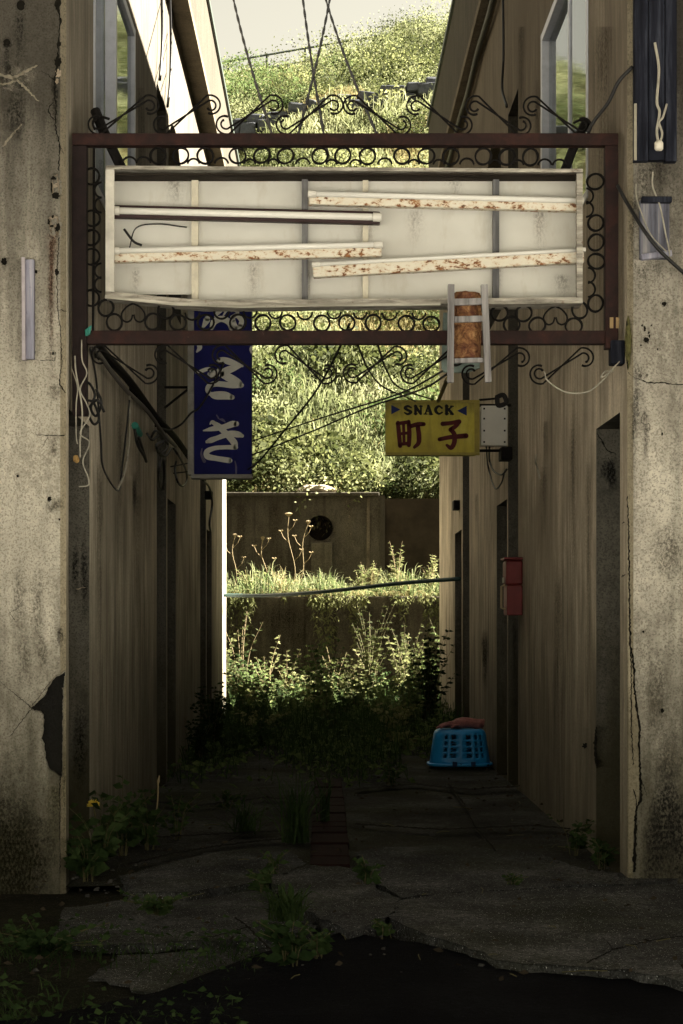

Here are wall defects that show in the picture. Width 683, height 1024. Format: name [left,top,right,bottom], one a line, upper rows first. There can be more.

crack [4,681,51,736]
peeling [31,670,66,777]
crack [622,496,647,872]
leakage [645,748,683,879]